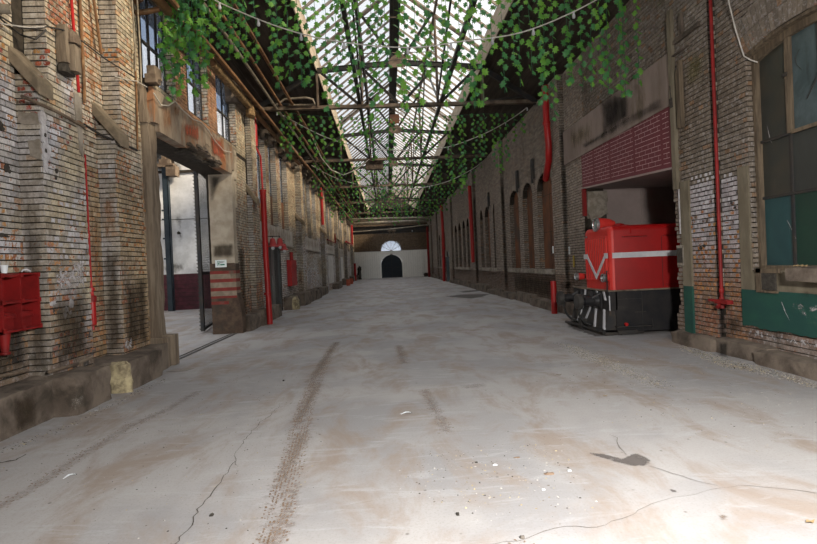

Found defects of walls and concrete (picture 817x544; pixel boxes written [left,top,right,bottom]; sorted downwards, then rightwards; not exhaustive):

crack [175,407,279,544]
water stain [592,453,650,466]